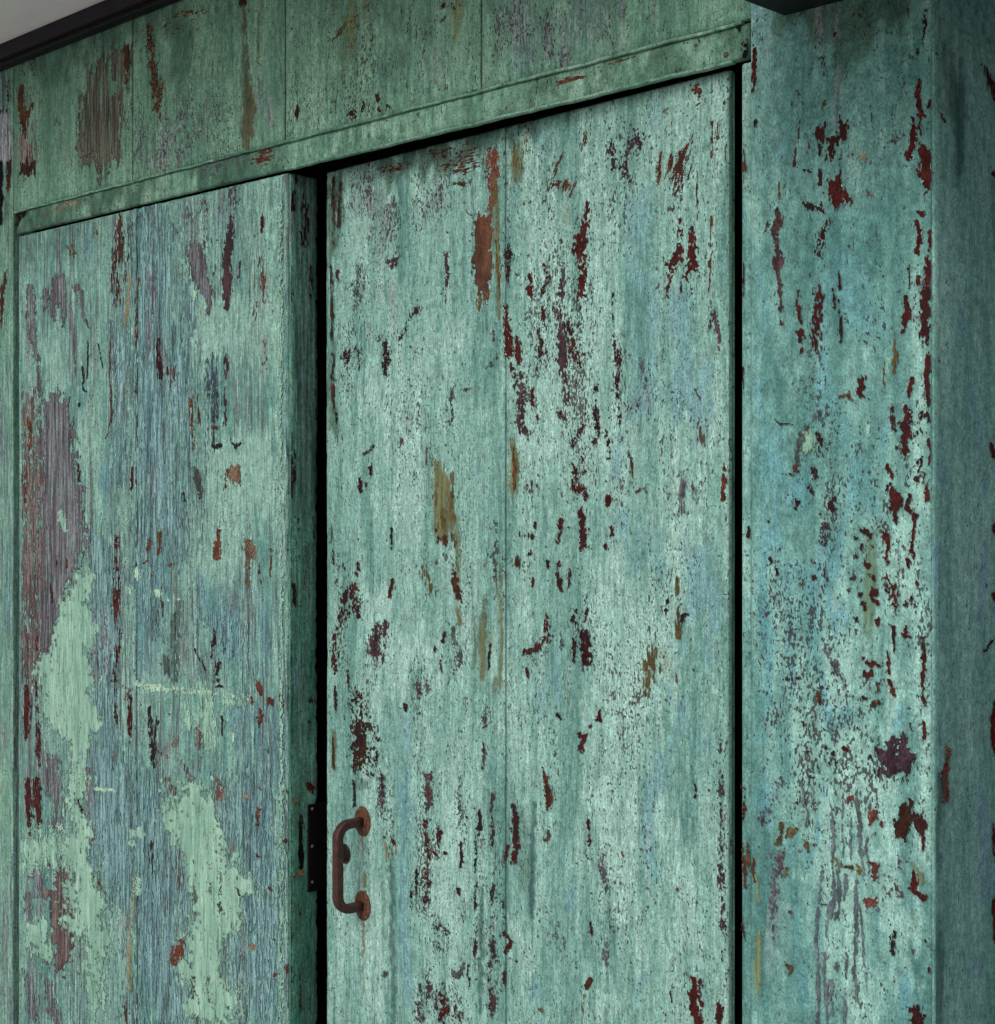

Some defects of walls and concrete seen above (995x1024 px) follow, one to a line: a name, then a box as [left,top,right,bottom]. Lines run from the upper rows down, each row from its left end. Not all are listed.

rust [483,146,501,213]
peeling [659,217,699,300]
peeling [485,304,539,440]
peeling [763,206,843,510]
peeling [846,74,931,707]
peeling [21,39,294,1024]
peeling [817,495,836,546]
peeling [330,554,394,823]
peeling [803,721,926,783]
peeling [834,798,928,906]